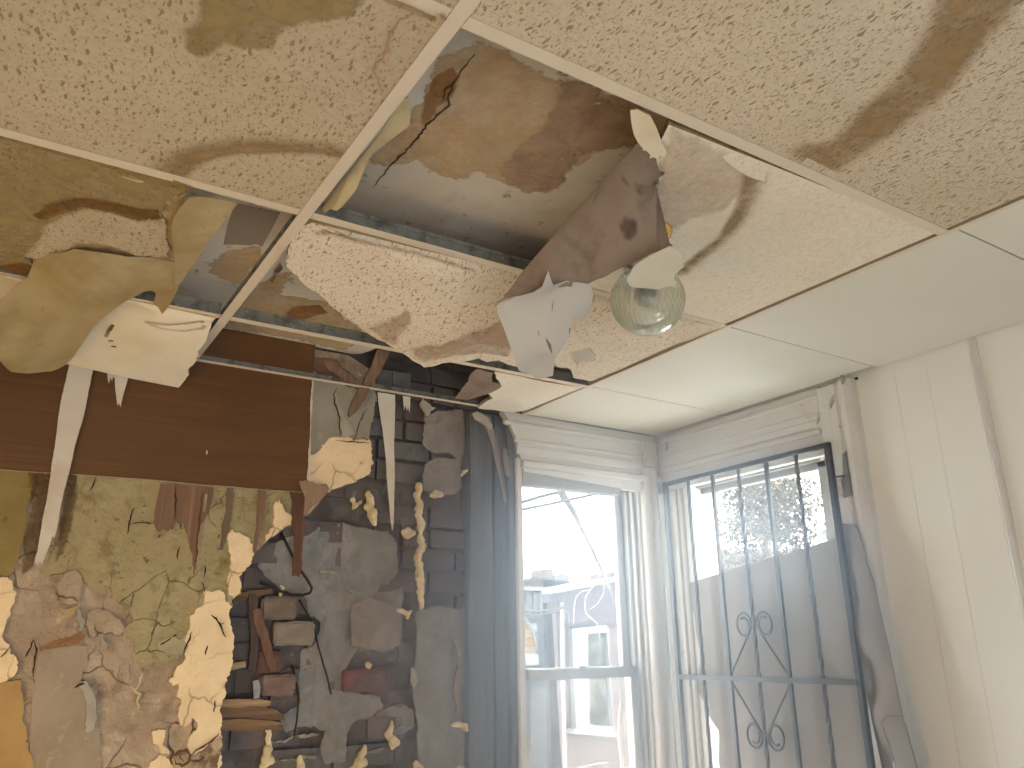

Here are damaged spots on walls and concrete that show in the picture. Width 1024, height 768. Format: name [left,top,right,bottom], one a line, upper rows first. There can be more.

damp [186,0,358,55]
crack [372,14,410,90]
crack [375,54,476,185]
damp [370,42,642,193]
damp [805,0,1011,170]
damp [0,137,344,275]
peeling [419,398,436,417]
peeling [0,470,34,768]
crack [128,508,181,564]
crack [160,566,226,655]
peeling [40,380,377,756]
peeling [148,729,173,768]